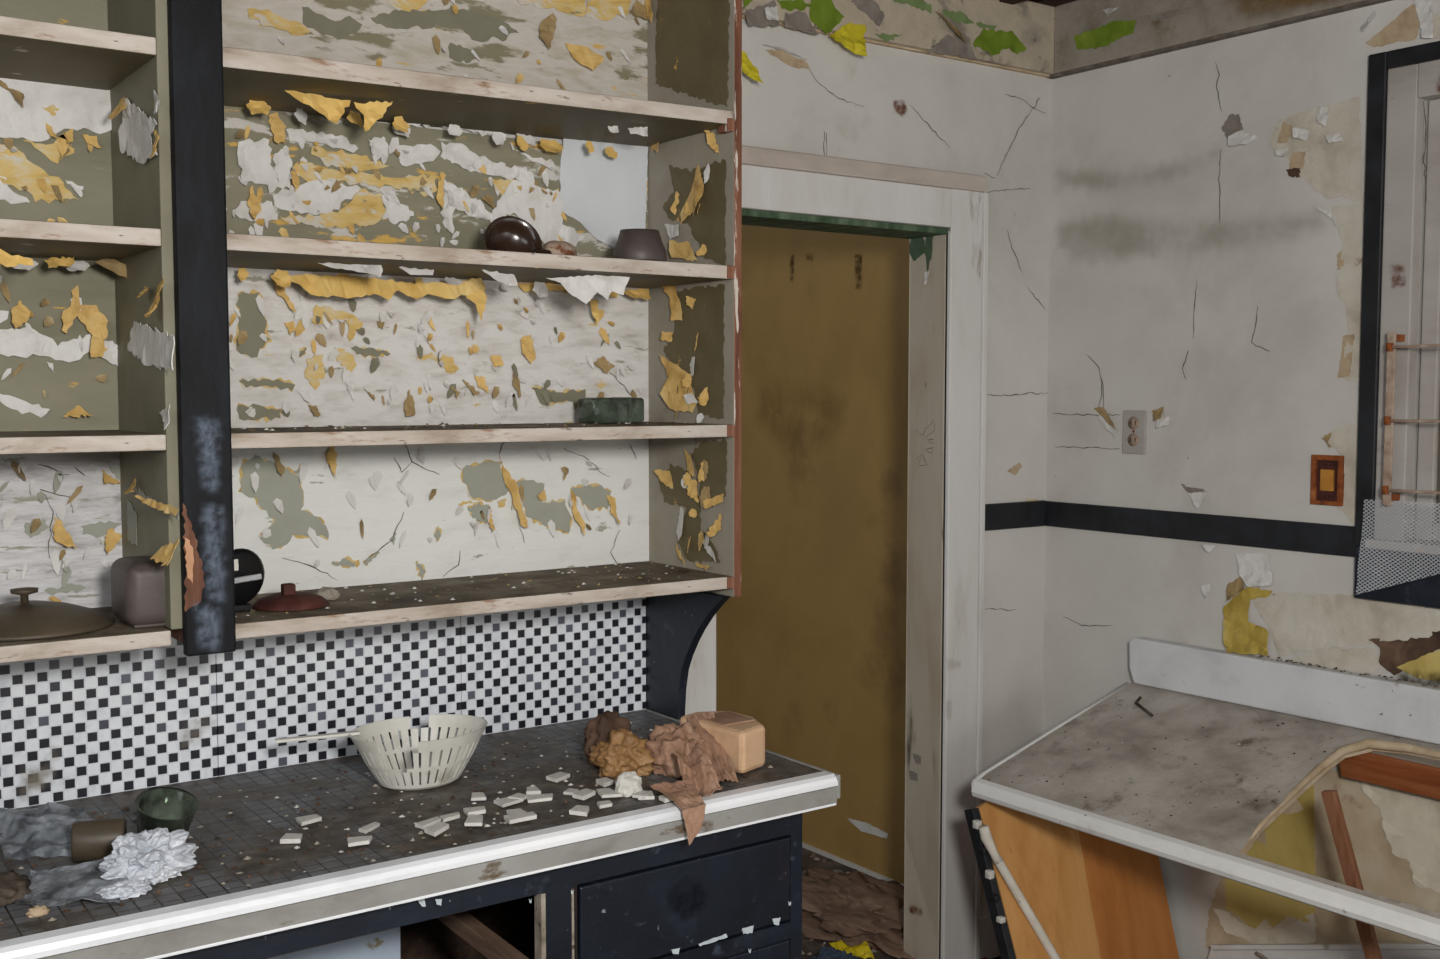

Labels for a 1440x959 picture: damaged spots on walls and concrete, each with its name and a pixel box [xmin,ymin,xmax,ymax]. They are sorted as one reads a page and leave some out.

peeling [516,0,1026,106]
peeling [0,78,160,223]
peeling [226,90,727,265]
crack [1215,151,1223,225]
peeling [1222,97,1364,384]
peeling [0,249,175,418]
peeling [228,262,725,423]
crack [1182,282,1197,379]
peeling [232,445,442,580]
peeling [453,442,633,563]
flaking render [1201,553,1440,680]
water stain [1401,675,1440,685]